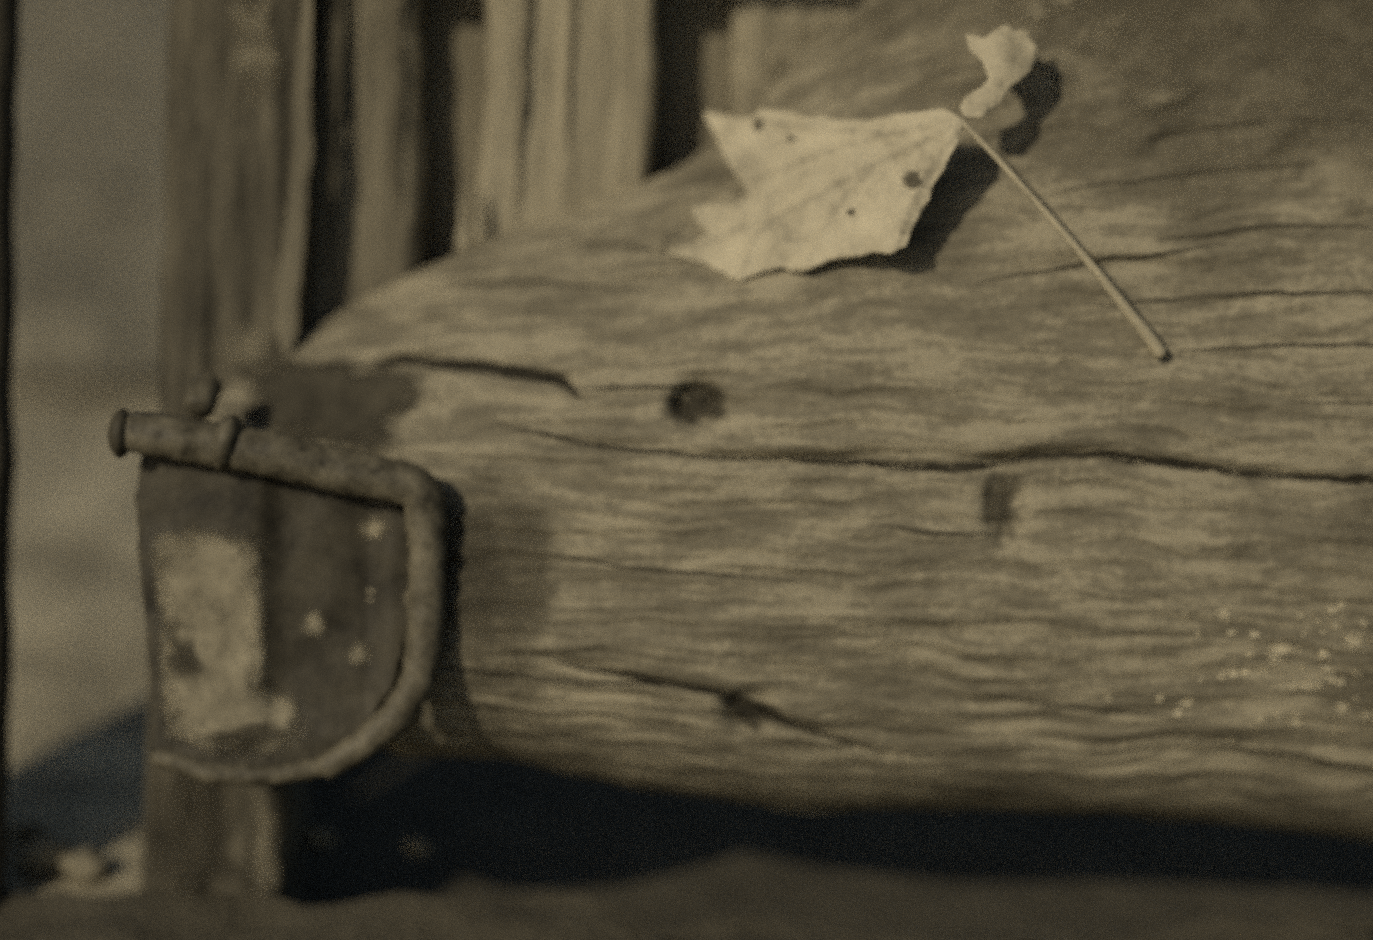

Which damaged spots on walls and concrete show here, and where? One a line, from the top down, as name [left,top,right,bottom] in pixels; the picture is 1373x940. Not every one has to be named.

crack [301,356,679,400]
crack [495,423,1373,486]
crack [438,657,885,756]